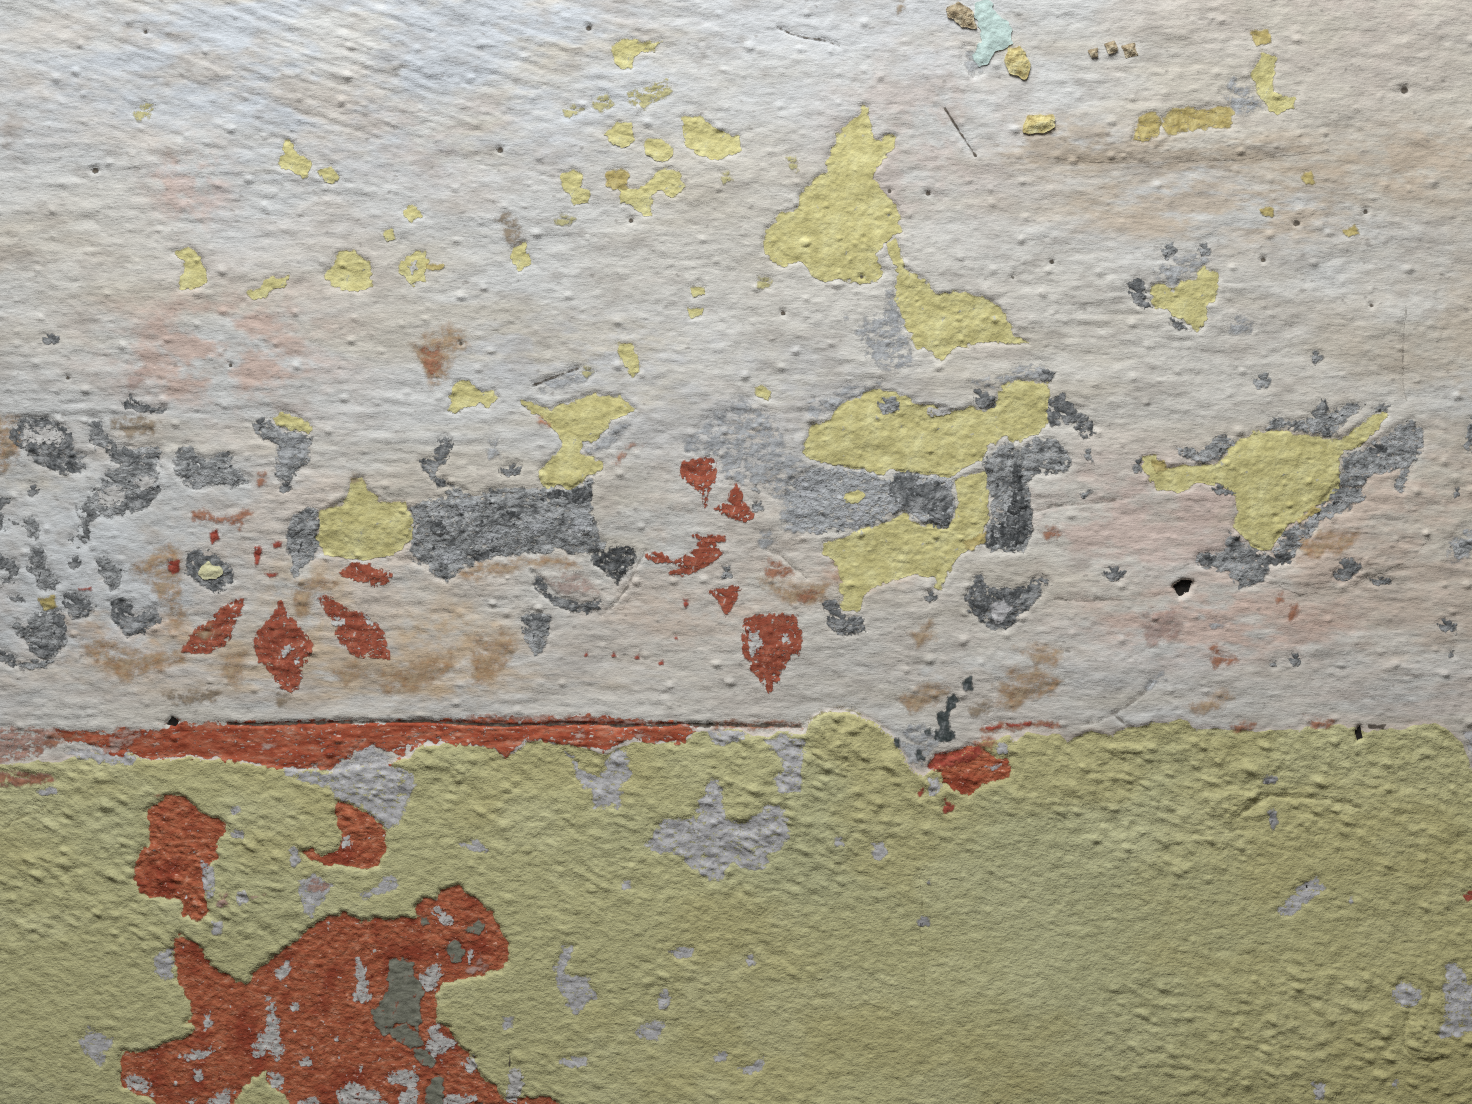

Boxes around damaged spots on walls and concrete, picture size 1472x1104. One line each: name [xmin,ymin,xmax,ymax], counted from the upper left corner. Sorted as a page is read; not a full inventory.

peeling [0,416,251,670]
peeling [121,393,167,414]
peeling [252,366,674,584]
peeling [618,343,640,378]
peeling [684,105,1097,636]
peeling [1133,398,1424,596]
spalling [64,746,136,765]
spalling [644,733,806,881]
peeling [927,737,1011,813]
peeling [78,745,560,1104]
spalling [1391,981,1422,1008]
spalling [1437,962,1472,1039]